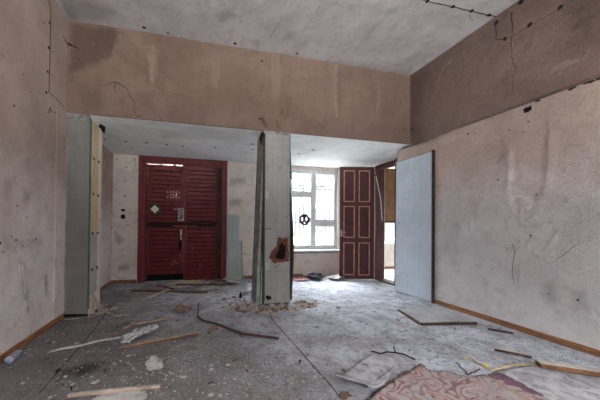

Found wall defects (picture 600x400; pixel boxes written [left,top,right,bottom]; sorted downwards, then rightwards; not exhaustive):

spalling [276,243,286,259]